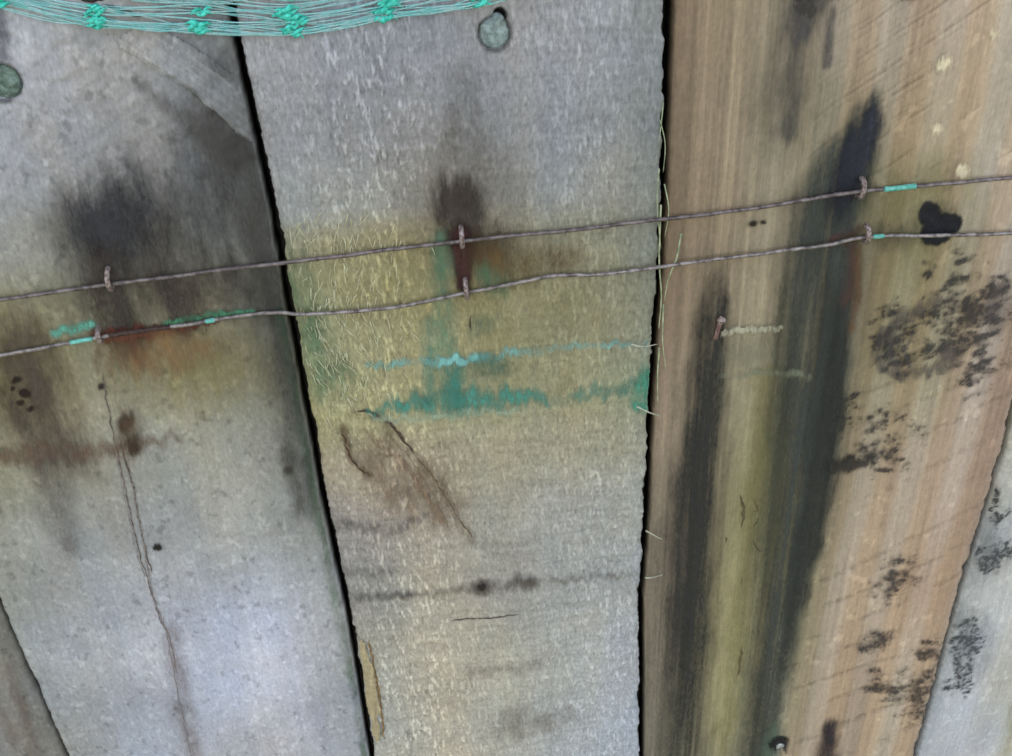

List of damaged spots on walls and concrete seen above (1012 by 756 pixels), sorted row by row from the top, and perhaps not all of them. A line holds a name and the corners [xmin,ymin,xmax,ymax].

leakage [786,0,835,67]
leakage [64,170,236,359]
corrosion [92,315,222,370]
leakage [435,177,496,263]
corrosion [451,226,509,291]
leakage [869,252,1012,401]
crack [103,375,192,756]
crack [340,409,472,536]
leakage [666,288,729,756]
leakage [742,93,922,756]
leakage [975,542,1012,574]
leakage [864,617,984,725]